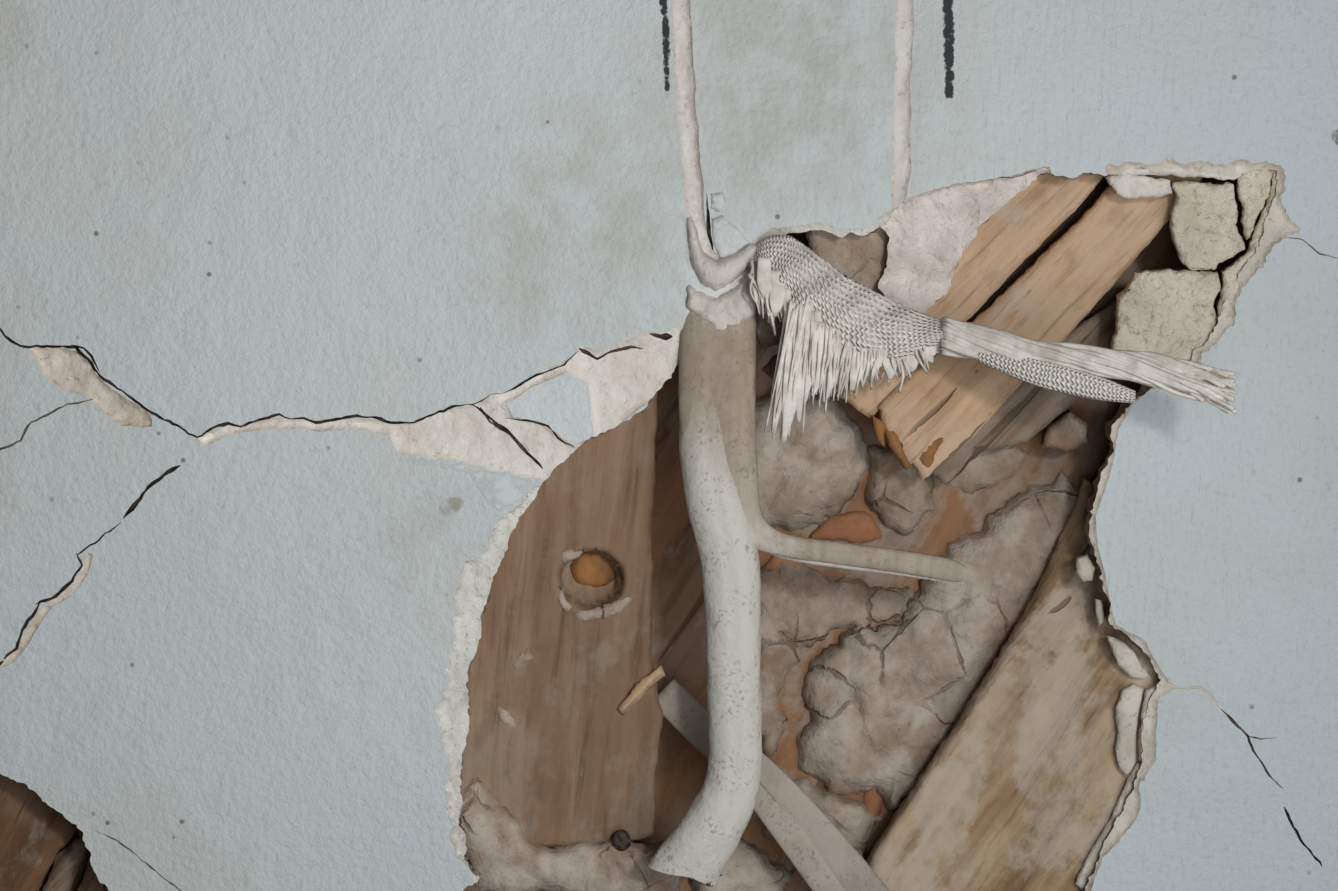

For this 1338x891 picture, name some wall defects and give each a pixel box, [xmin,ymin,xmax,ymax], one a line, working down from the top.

spalling [712,158,1300,363]
crack [0,328,673,668]
spalling [198,326,683,891]
peeling [809,511,883,544]
spalling [1075,384,1175,891]
crack [1162,680,1322,866]